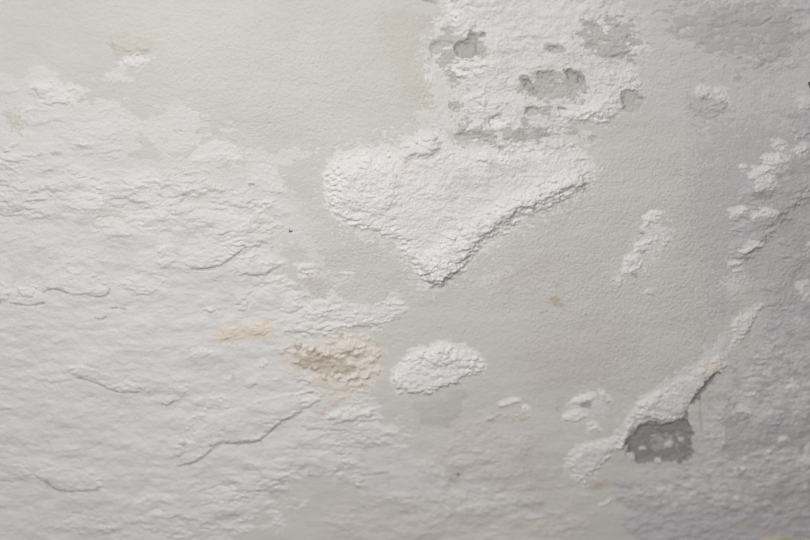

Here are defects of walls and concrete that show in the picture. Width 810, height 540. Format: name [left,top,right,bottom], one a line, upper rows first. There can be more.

water stain [0,164,600,540]
water stain [313,0,810,540]
flaking render [623,323,810,524]